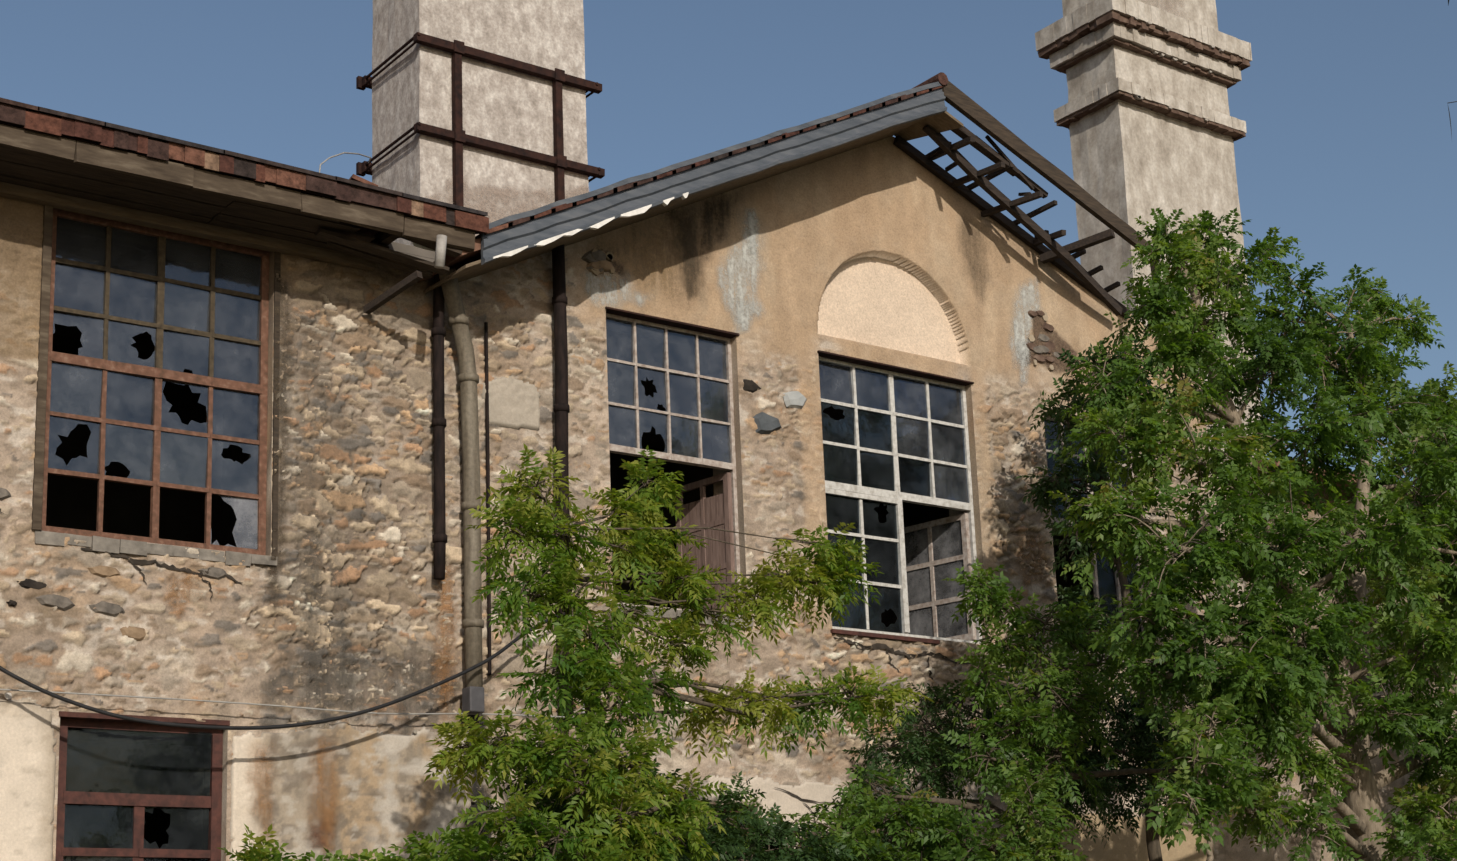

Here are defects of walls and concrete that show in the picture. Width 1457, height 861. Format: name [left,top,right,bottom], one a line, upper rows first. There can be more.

water stain [586,196,730,304]
water stain [719,212,761,331]
spalling [1021,310,1079,371]
crack [81,547,242,602]